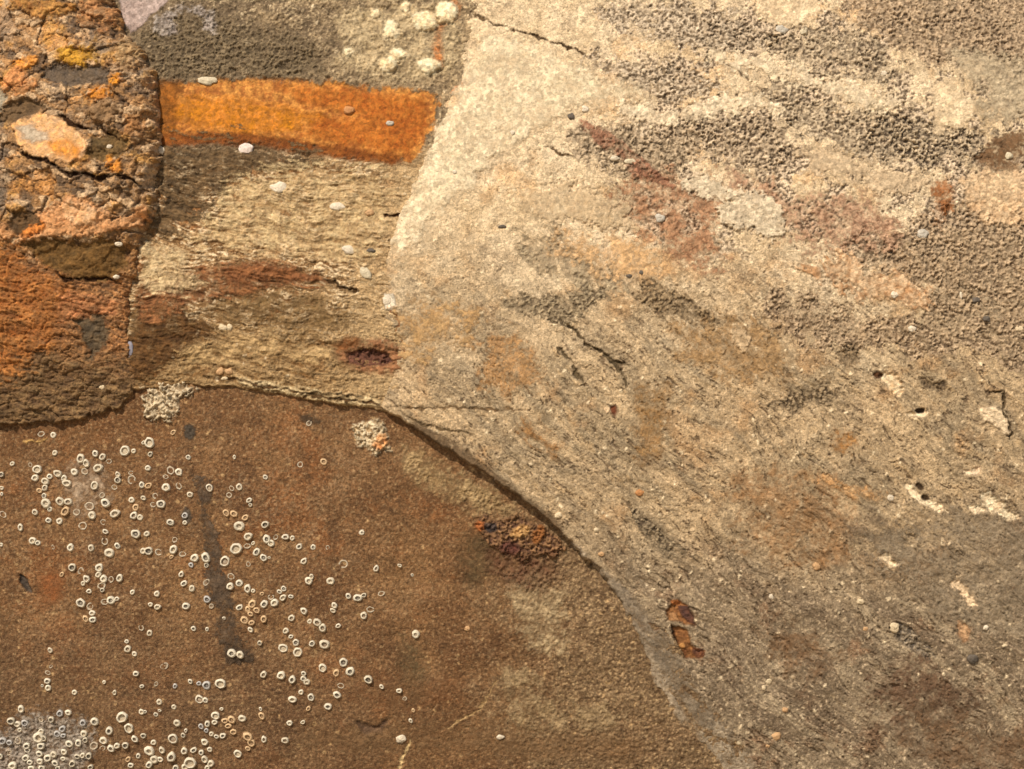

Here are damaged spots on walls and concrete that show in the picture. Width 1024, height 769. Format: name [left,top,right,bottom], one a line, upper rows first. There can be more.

crack [474,13,589,59]
crack [58,114,120,140]
rust [158,76,441,164]
crack [21,152,141,188]
leakage [125,0,904,423]
crack [547,319,627,386]